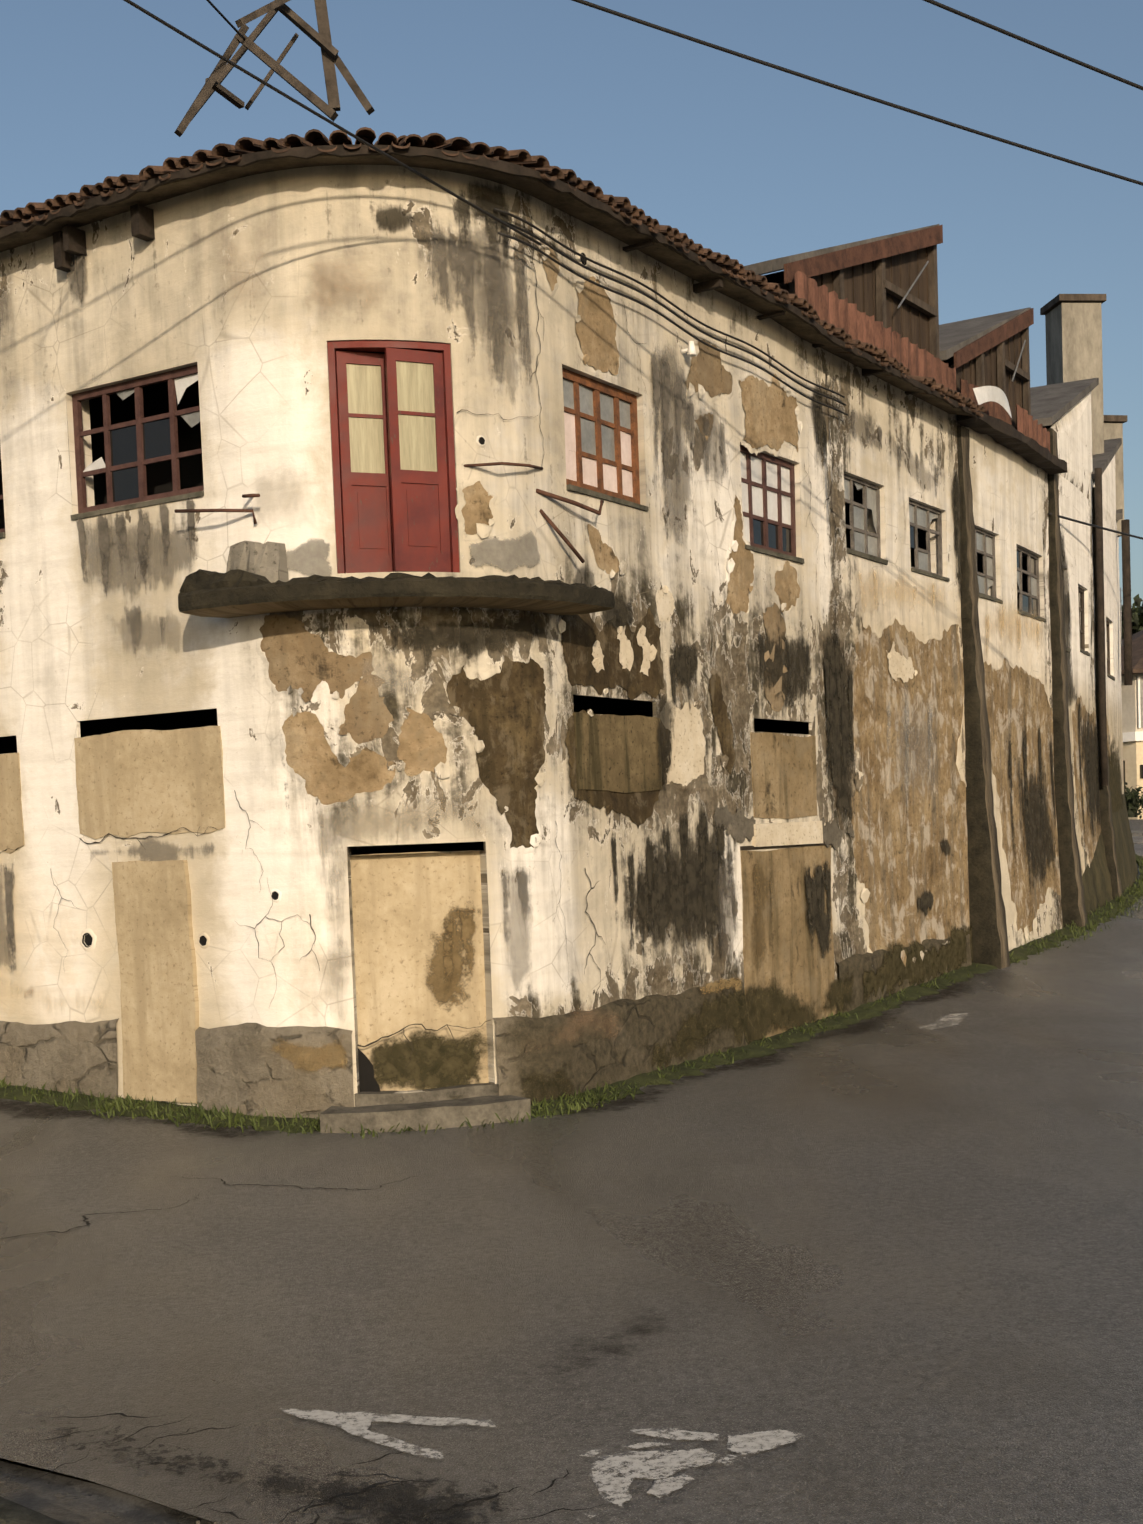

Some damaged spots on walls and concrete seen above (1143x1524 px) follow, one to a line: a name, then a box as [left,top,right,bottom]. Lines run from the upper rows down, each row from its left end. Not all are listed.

leakage [376,206,413,231]
leakage [424,183,531,370]
peeling [538,241,621,381]
peeling [681,335,803,457]
leakage [76,503,170,593]
peeling [455,475,498,541]
peeling [255,584,736,854]
leakage [758,630,855,819]
peeling [820,612,970,966]
peeling [983,654,1061,942]
leakage [4,867,15,956]
leakage [611,813,773,963]